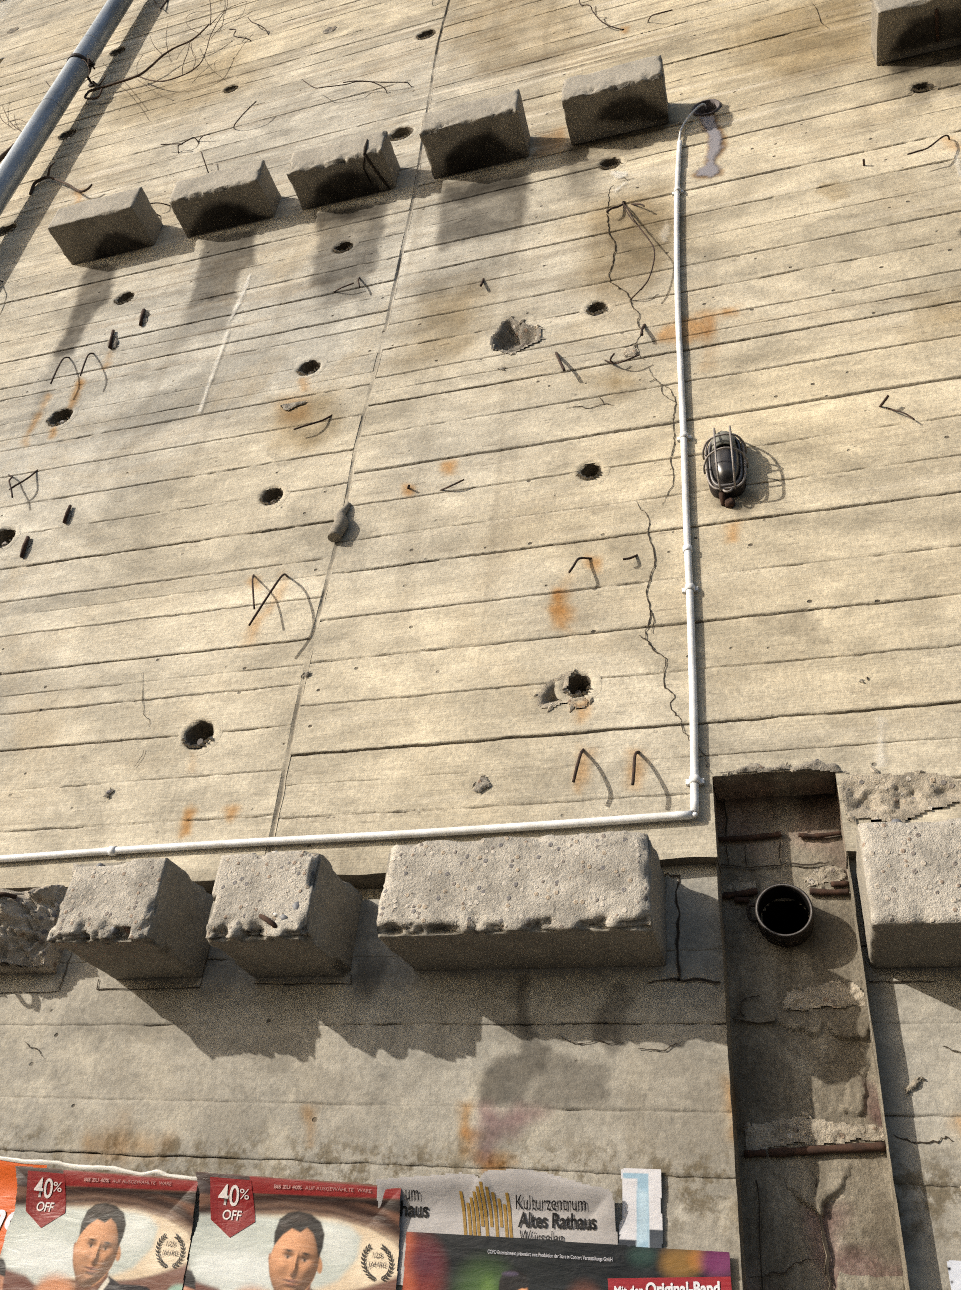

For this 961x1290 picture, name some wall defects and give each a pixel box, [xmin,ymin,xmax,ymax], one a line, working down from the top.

spalling [490,316,544,370]
crack [606,171,711,773]
spalling [534,665,602,713]
spalling [718,831,782,842]
spalling [720,759,961,839]
spalling [0,884,67,975]
spalling [732,978,886,1218]
crack [748,1258,819,1278]